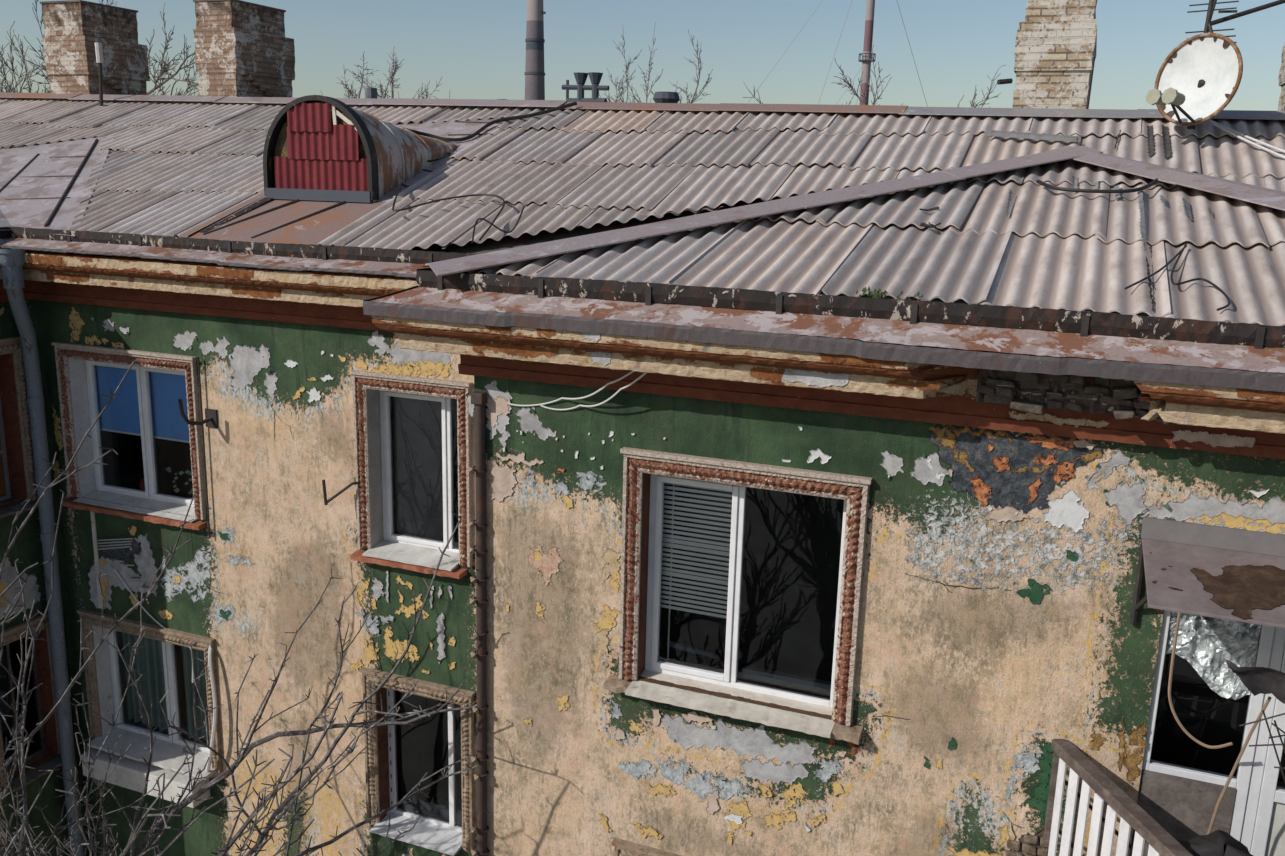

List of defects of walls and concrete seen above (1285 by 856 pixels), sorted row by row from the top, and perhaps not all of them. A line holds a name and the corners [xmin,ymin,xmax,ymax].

rust [27,254,89,283]
rust [196,265,281,298]
peeling [173,330,452,403]
rust [471,325,558,358]
rust [819,353,941,391]
flaking render [980,350,1129,362]
peeling [466,380,614,508]
spalling [880,369,1285,604]
peeling [88,526,254,624]
peeling [350,571,456,674]
peeling [1190,565,1285,619]
peeling [608,698,844,845]